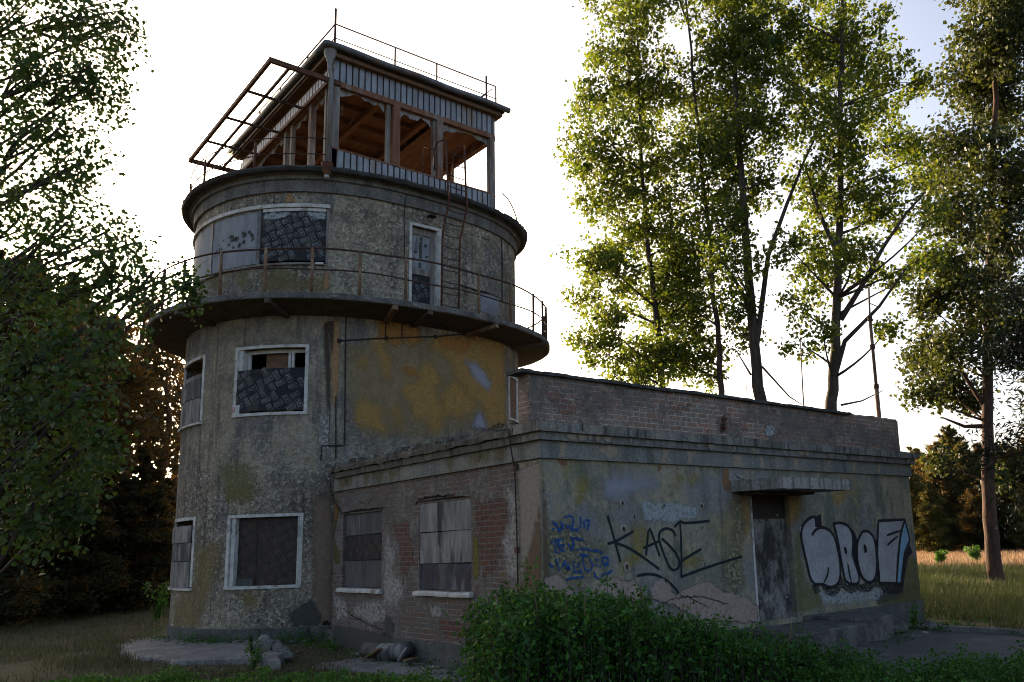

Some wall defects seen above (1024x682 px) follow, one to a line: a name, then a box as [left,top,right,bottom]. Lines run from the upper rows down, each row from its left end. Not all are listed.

damp [403,336,506,432]
flaking render [544,443,764,624]
crack [663,594,727,608]